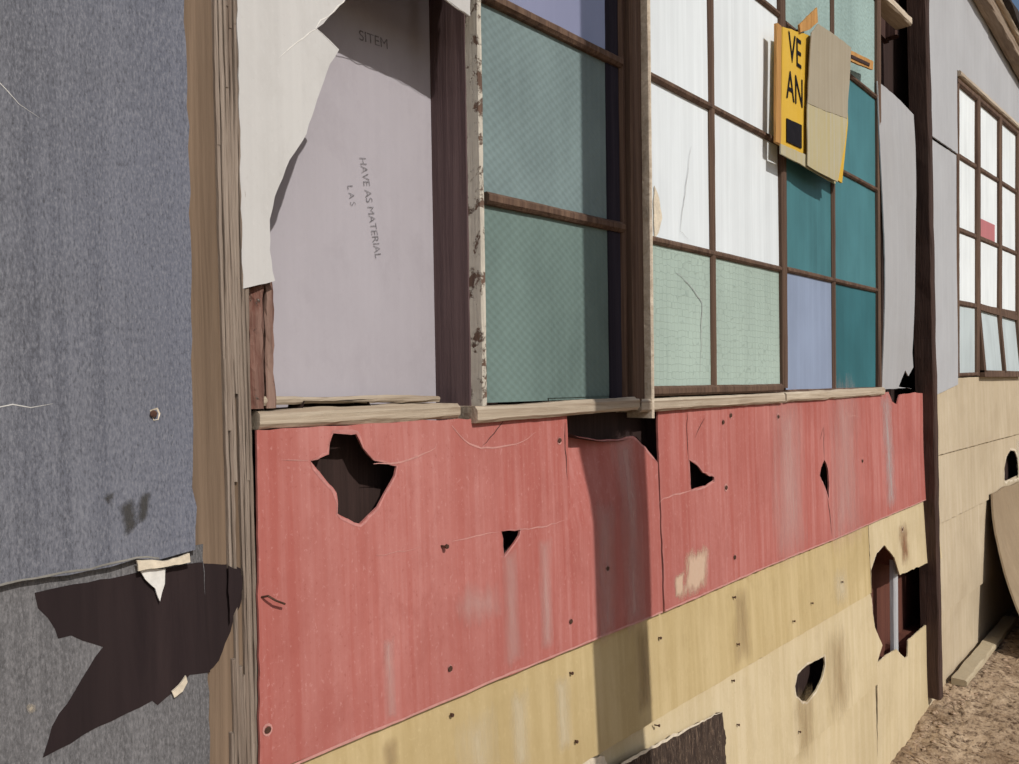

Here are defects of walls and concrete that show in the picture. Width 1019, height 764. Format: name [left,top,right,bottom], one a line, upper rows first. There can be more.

spalling [136,553,190,601]
peeling [171,675,188,698]
spalling [619,711,726,764]